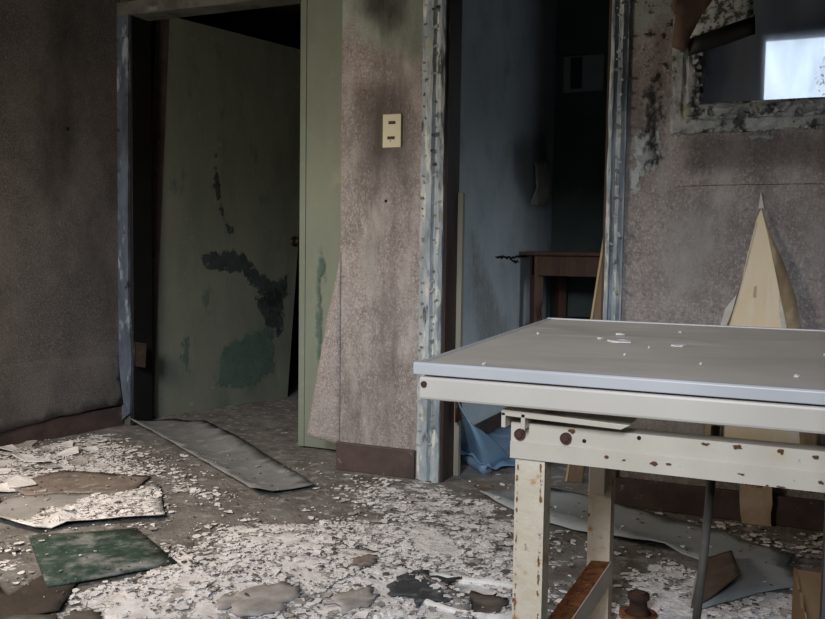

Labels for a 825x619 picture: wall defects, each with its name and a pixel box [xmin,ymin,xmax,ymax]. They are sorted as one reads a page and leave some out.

water stain [630,19,673,207]
peeling [691,52,824,120]
peeling [201,250,290,337]